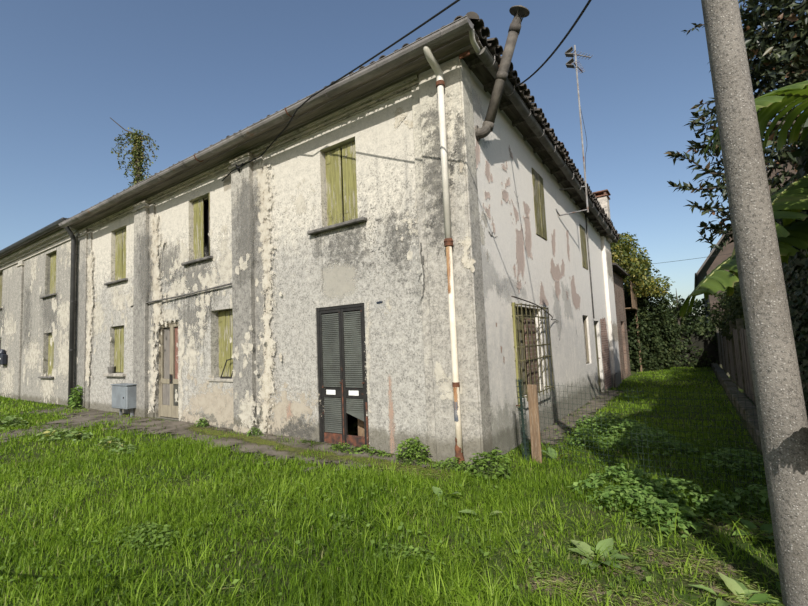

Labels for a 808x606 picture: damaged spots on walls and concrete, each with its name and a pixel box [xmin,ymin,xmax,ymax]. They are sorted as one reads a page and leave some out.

peeling [60,240,71,269]
peeling [0,250,133,404]
damp [139,236,217,349]
peeling [148,156,288,437]
damp [315,219,373,269]
damp [376,104,465,270]
peeling [457,192,496,273]
damp [281,417,316,441]